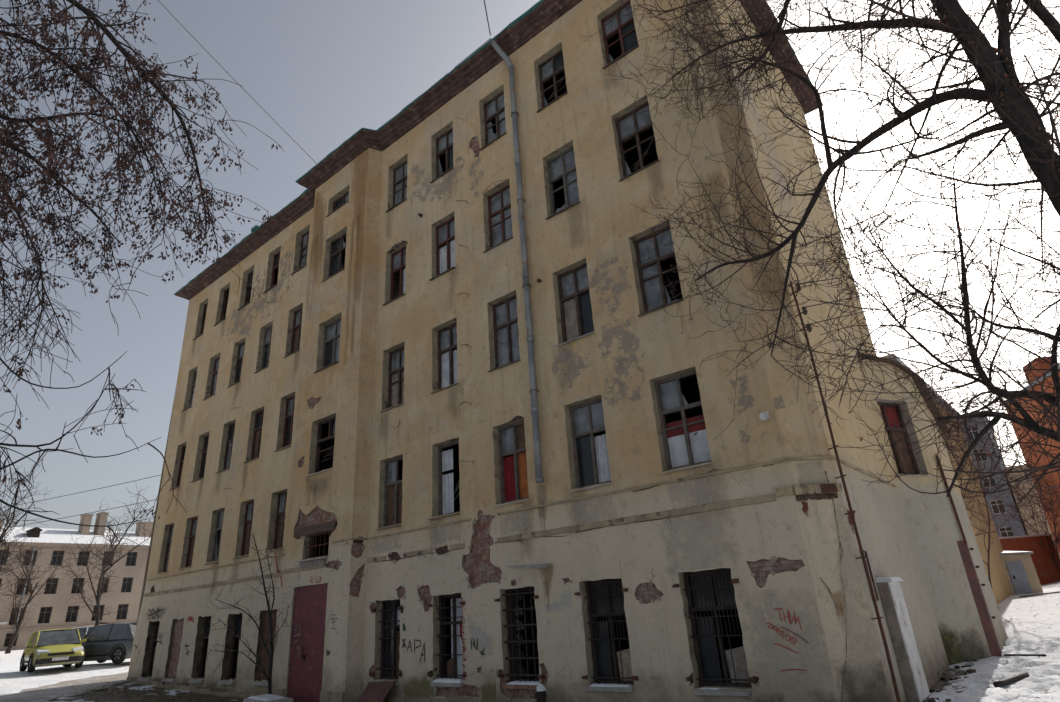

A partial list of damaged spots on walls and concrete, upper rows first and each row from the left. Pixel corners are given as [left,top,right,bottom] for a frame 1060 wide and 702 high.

peeling [411,135,484,202]
peeling [590,258,644,405]
spalling [294,504,337,540]
spalling [325,536,366,597]
spalling [433,544,449,555]
spalling [462,510,516,589]
spalling [746,556,805,588]
spalling [396,585,438,612]
spalling [634,581,664,604]